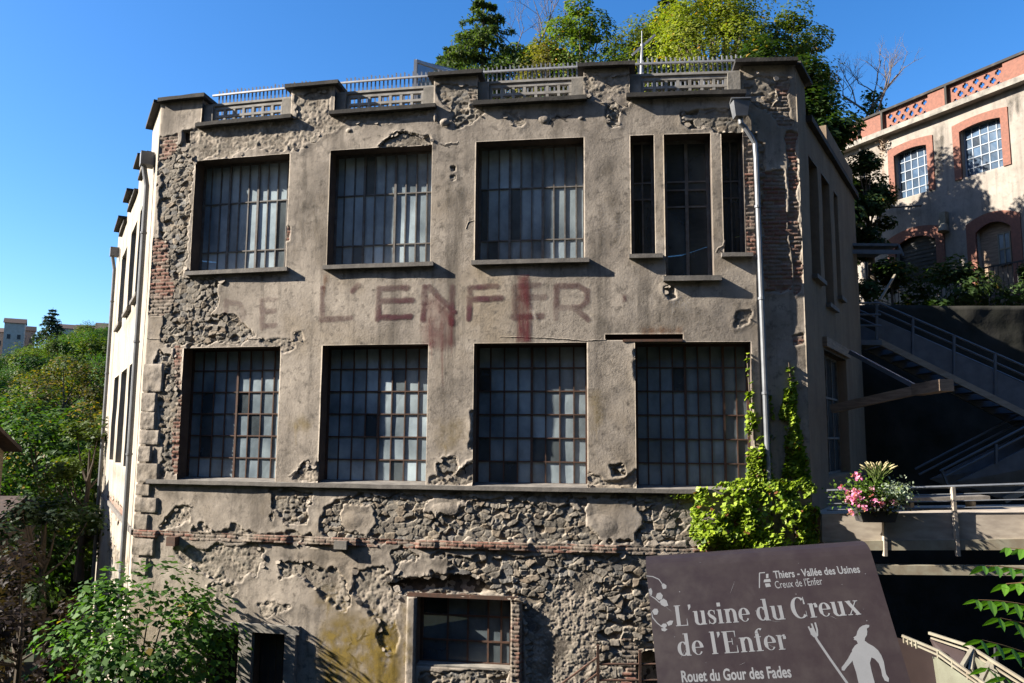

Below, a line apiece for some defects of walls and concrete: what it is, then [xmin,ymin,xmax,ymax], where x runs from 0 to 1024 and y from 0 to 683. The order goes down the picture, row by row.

spalling [148,89,434,479]
flaking render [437,83,484,129]
flaking render [583,74,630,128]
flaking render [681,71,803,301]
flaking render [736,311,751,326]
spalling [159,457,698,683]